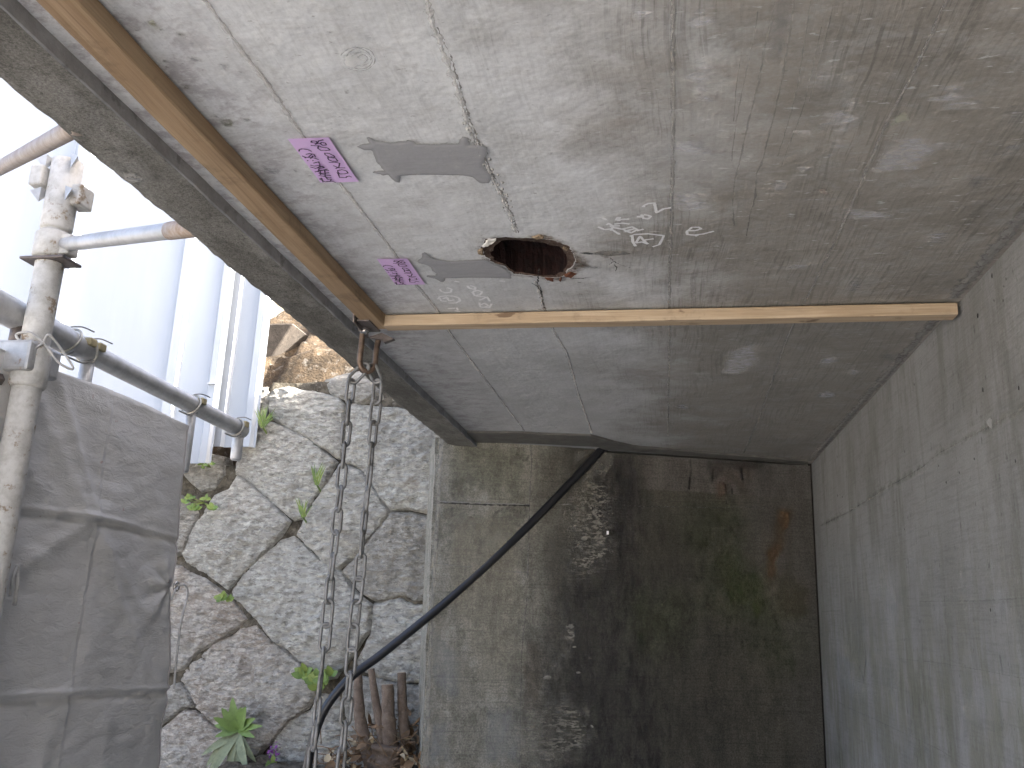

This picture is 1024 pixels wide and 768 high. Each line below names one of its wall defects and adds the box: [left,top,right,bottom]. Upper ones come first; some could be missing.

crack [436,27,519,233]
crack [532,268,545,309]
spalling [477,234,630,282]
water stain [530,469,633,768]